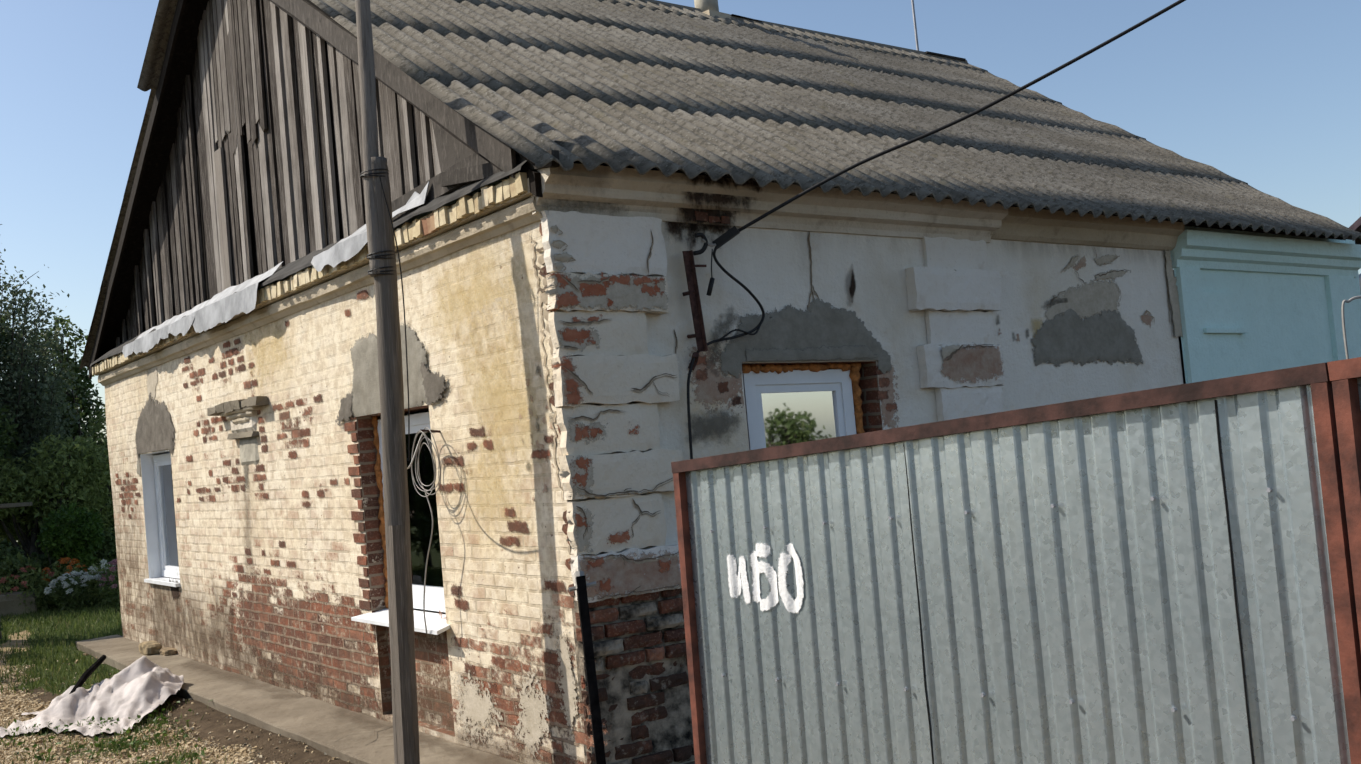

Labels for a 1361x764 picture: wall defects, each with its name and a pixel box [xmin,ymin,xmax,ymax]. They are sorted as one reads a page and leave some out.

damp [667,173,762,249]
spalling [1045,248,1131,320]
peeling [687,345,744,413]
peeling [940,317,1029,383]
peeling [177,338,322,503]
spalling [438,224,695,764]